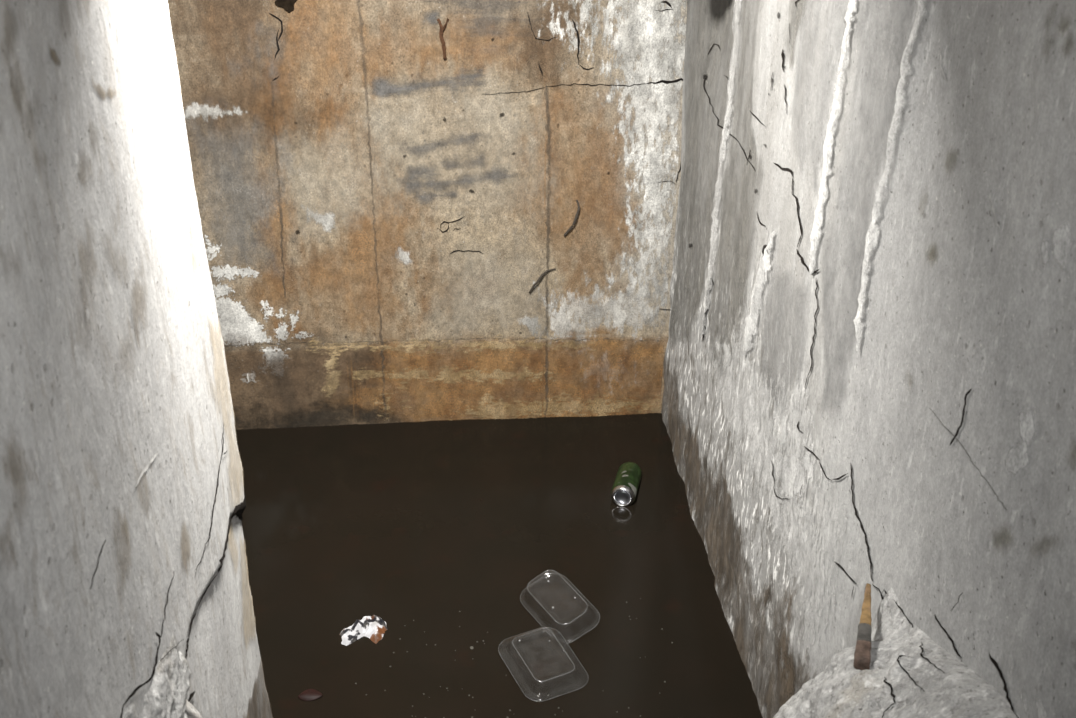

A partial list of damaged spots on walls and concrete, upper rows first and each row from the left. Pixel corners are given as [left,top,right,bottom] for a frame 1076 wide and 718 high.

leakage [185,103,242,118]
crack [496,0,819,388]
leakage [220,0,807,718]
crack [120,423,240,718]
crack [797,421,962,658]
crack [989,653,1019,718]